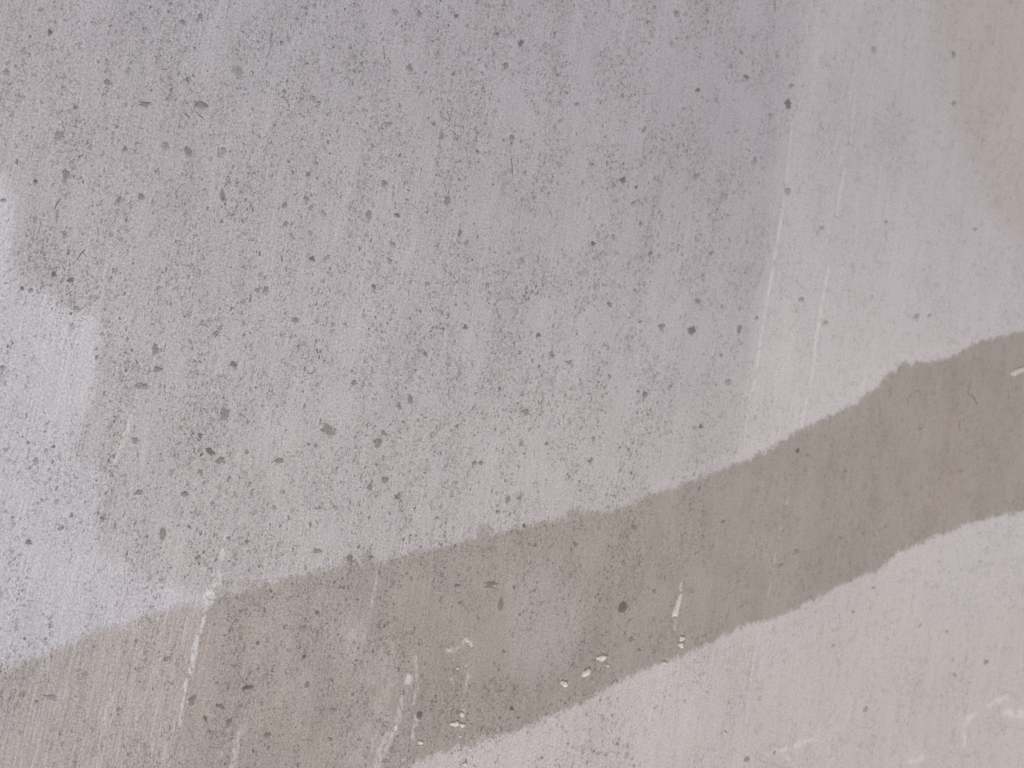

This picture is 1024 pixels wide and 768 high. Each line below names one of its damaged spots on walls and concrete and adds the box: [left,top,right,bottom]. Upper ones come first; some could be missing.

leakage [0,0,840,608]
leakage [0,582,210,768]
leakage [156,318,1024,768]